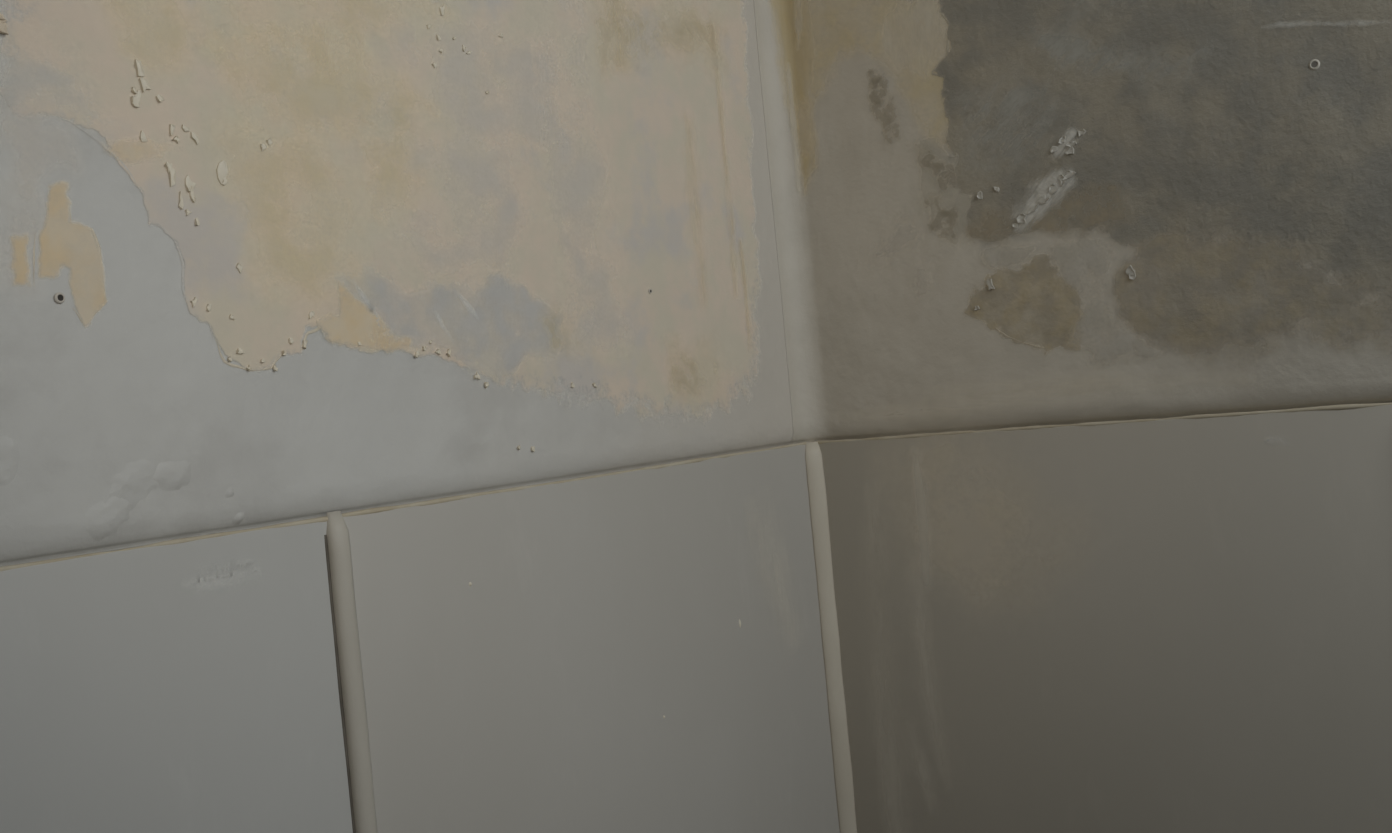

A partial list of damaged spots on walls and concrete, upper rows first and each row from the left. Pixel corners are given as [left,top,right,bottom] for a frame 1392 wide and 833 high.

peeling [11,182,107,326]